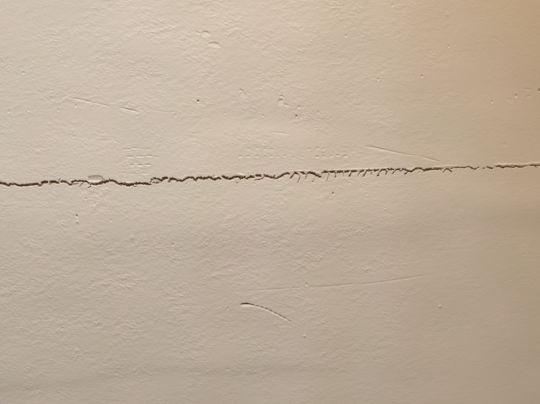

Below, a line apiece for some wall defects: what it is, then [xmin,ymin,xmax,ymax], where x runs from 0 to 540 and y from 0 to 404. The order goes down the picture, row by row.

crack [0,162,540,189]